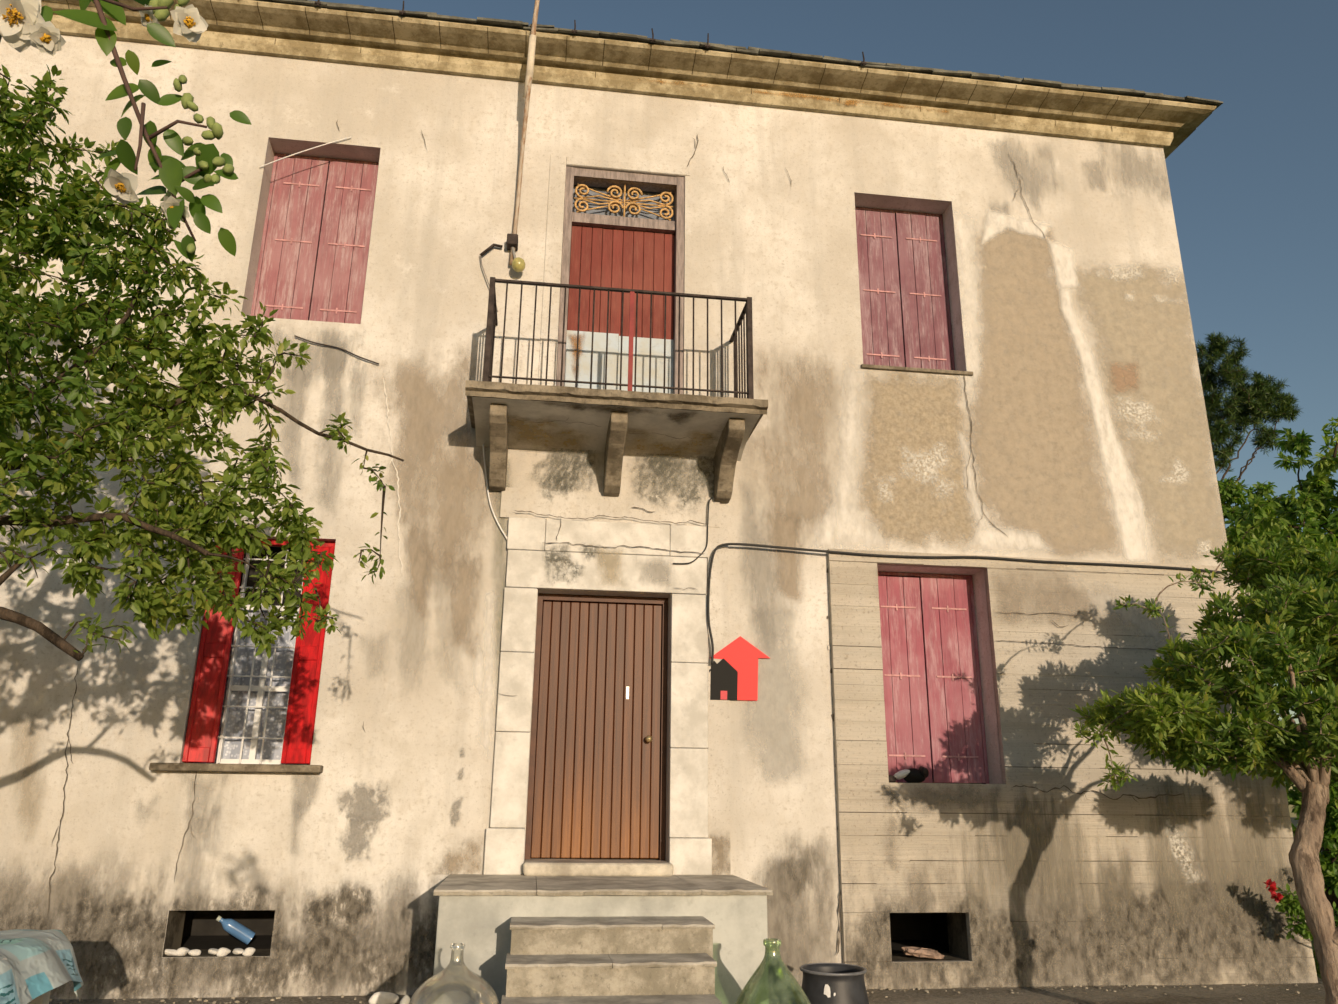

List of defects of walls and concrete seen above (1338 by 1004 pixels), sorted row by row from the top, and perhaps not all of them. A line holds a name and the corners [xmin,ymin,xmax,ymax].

leakage [508,420,594,490]
leakage [633,434,714,502]
peeling [861,228,1116,555]
leakage [953,206,1147,561]
peeling [1075,264,1228,558]
crack [47,667,78,916]
crack [174,772,197,882]
leakage [340,786,388,857]
leakage [0,872,438,999]
leakage [763,852,830,986]
leakage [854,800,1307,990]